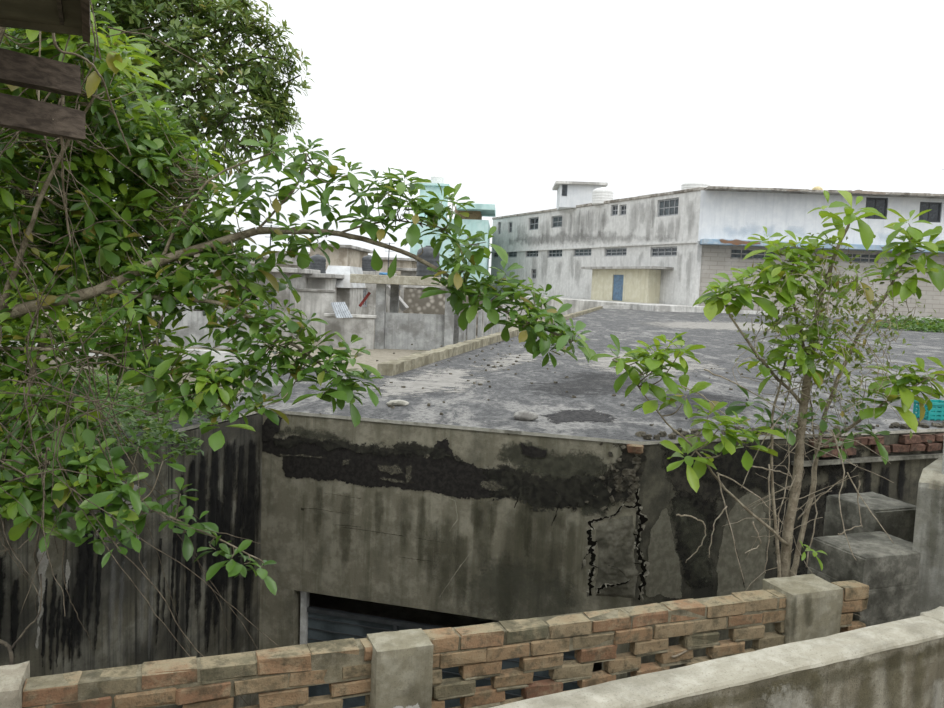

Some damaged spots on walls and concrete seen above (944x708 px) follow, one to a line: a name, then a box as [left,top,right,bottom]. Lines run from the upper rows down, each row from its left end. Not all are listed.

leakage [272,427,463,464]
peeling [262,416,531,500]
peeling [520,442,547,458]
leakage [482,442,615,517]
spalling [541,442,647,511]
leakage [0,556,20,655]
leakage [41,506,105,670]
leakage [156,439,260,654]